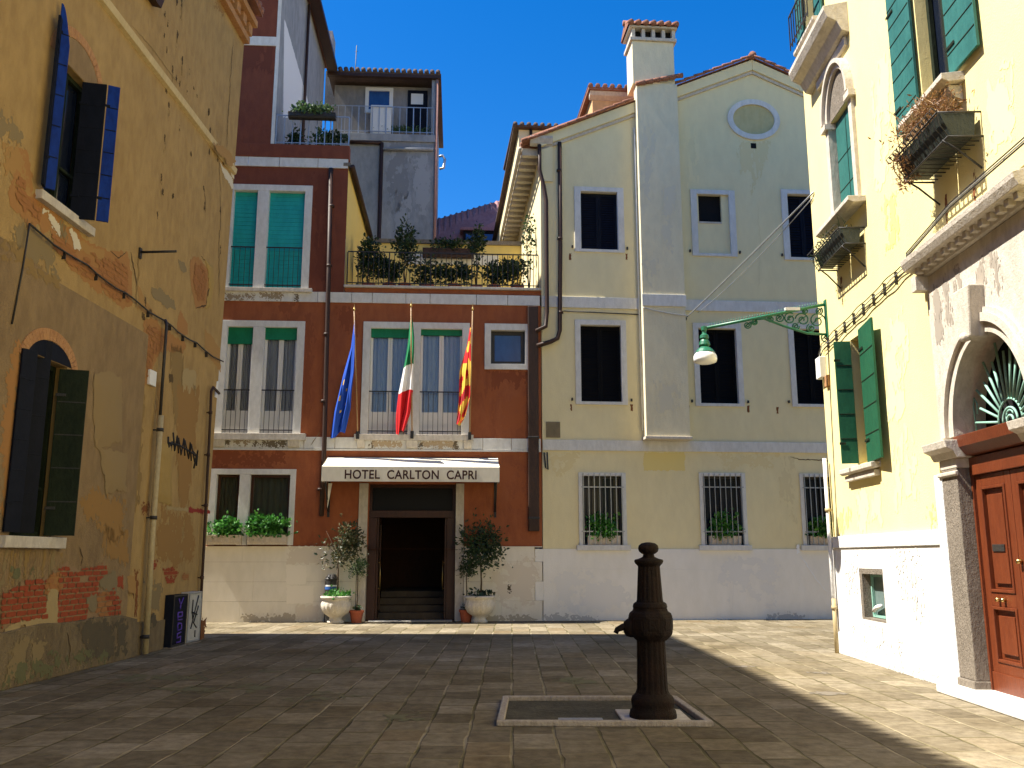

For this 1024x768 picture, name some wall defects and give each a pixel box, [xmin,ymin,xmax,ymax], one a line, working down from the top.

flaking render [8,147,186,385]
flaking render [1,561,124,632]
damp [77,616,129,662]